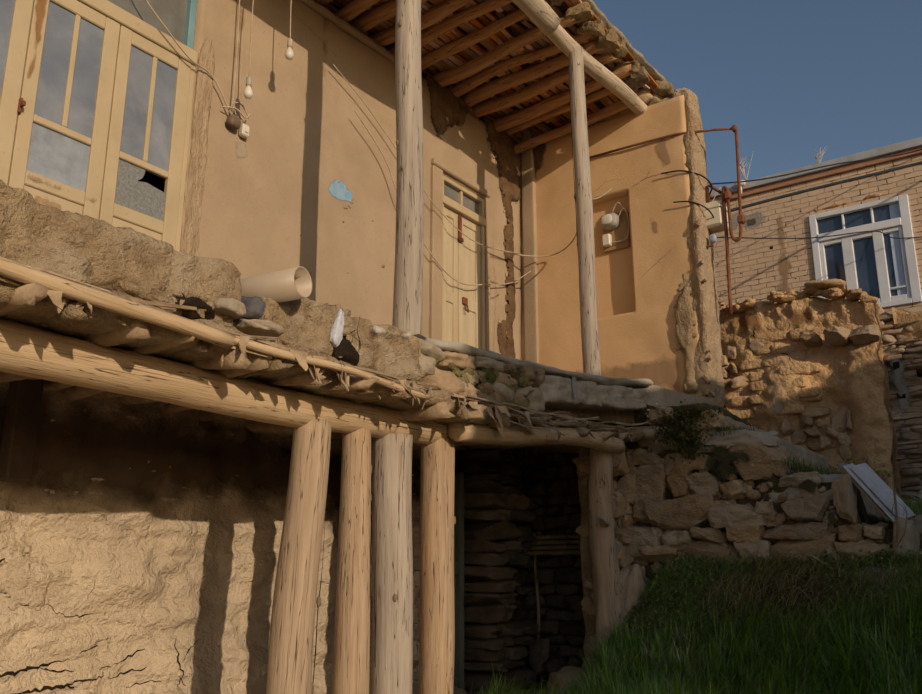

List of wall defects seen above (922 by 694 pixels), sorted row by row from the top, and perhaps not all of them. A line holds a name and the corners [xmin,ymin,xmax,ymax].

corrosion [36,0,47,42]
flaking render [424,73,473,139]
flaking render [484,117,521,358]
flaking render [673,282,698,394]
crack [0,639,201,694]